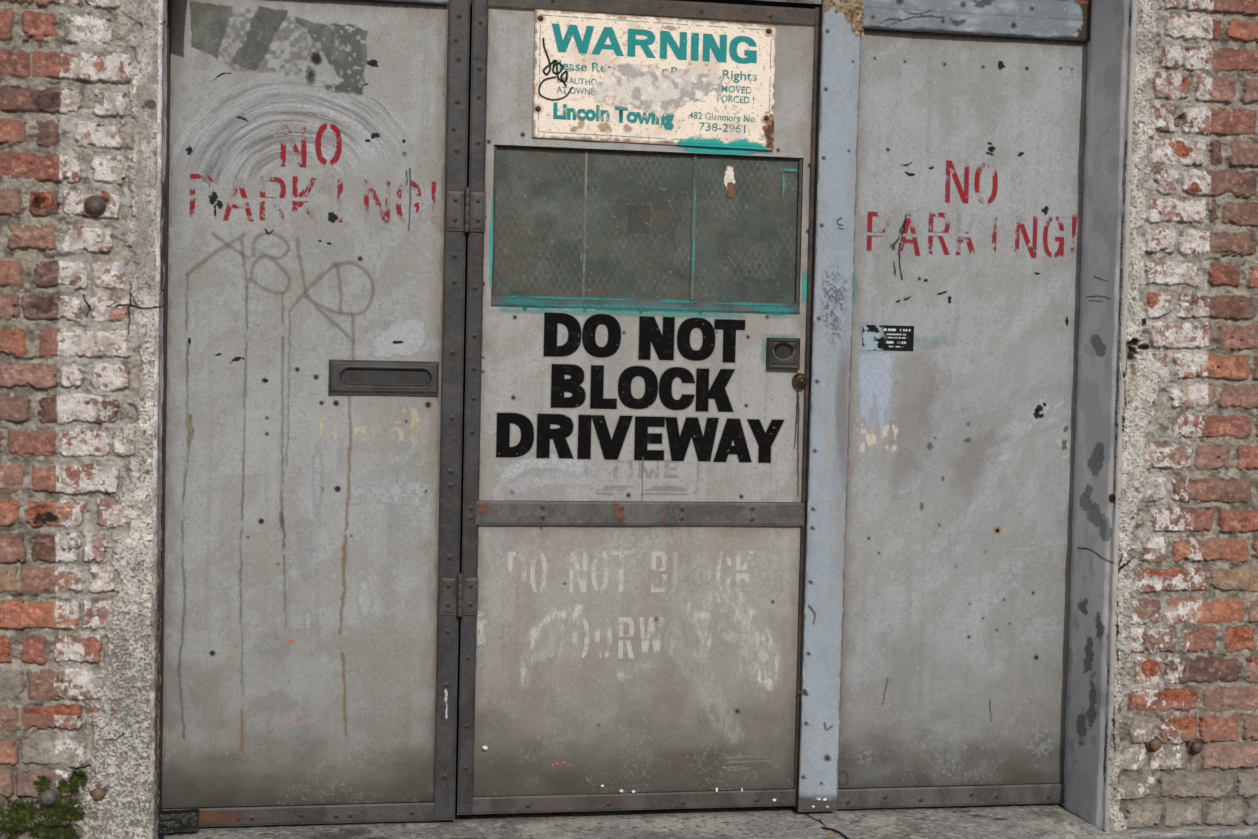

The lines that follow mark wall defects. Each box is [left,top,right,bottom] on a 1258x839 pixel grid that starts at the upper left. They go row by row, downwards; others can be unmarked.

rust [824,0,865,37]
peeling [1091,335,1106,356]
peeling [1125,0,1214,795]
peeling [1080,443,1115,541]
rust [339,522,348,632]